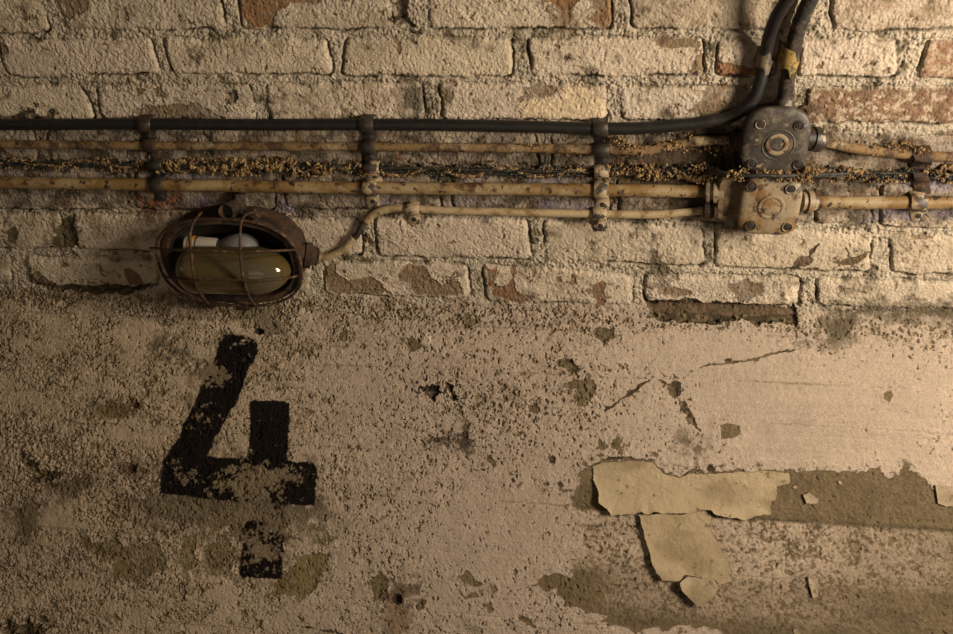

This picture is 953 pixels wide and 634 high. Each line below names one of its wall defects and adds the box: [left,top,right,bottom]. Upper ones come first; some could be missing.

peeling [239,0,319,35]
peeling [324,260,487,332]
peeling [479,258,622,345]
spalling [644,273,821,352]
spalling [414,378,466,405]
crack [604,349,799,432]
peeling [528,430,953,634]